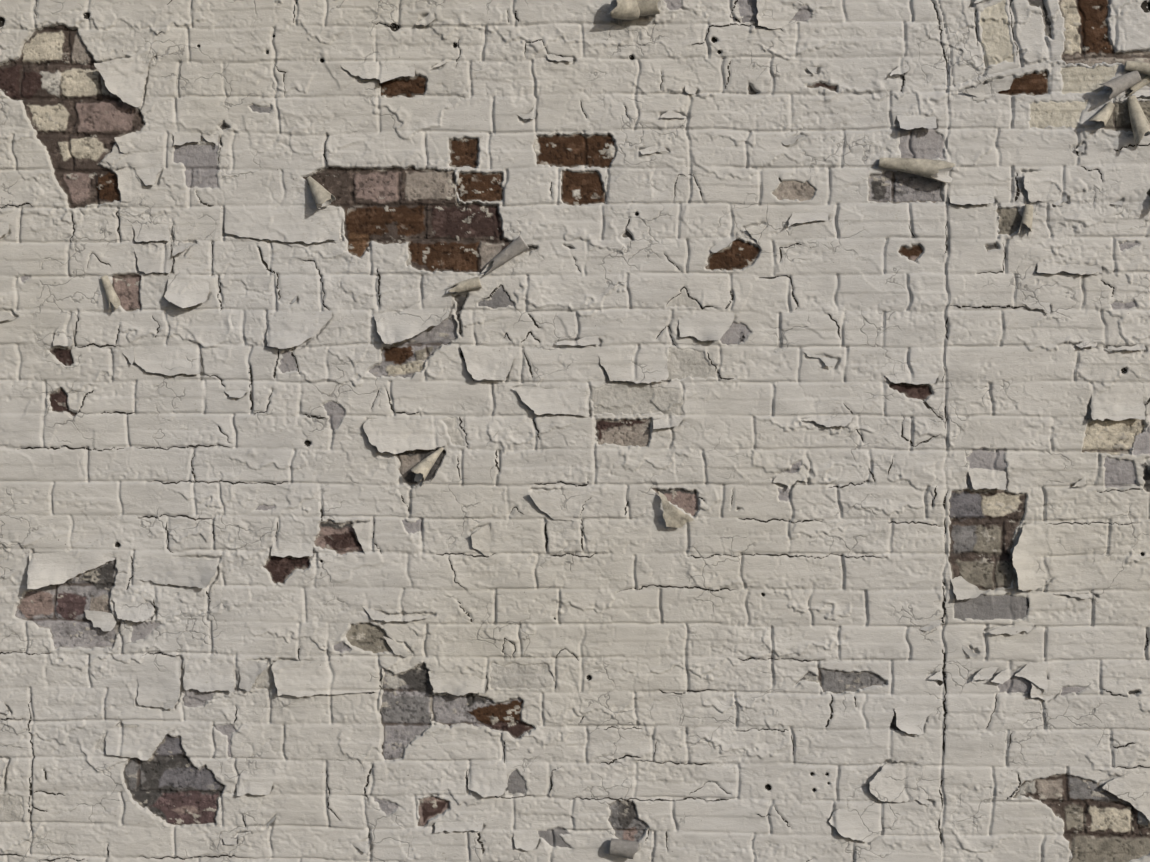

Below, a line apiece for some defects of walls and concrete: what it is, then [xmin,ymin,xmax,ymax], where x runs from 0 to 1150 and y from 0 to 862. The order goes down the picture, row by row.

peeling [0,13,164,209]
peeling [961,0,1150,146]
peeling [533,134,617,206]
peeling [224,137,538,378]
peeling [1082,391,1150,492]
peeling [15,542,160,649]
peeling [263,519,374,584]
peeling [948,448,1097,621]
peeling [334,606,535,760]
peeling [95,722,225,826]
peeling [214,724,236,757]
peeling [1013,770,1150,862]